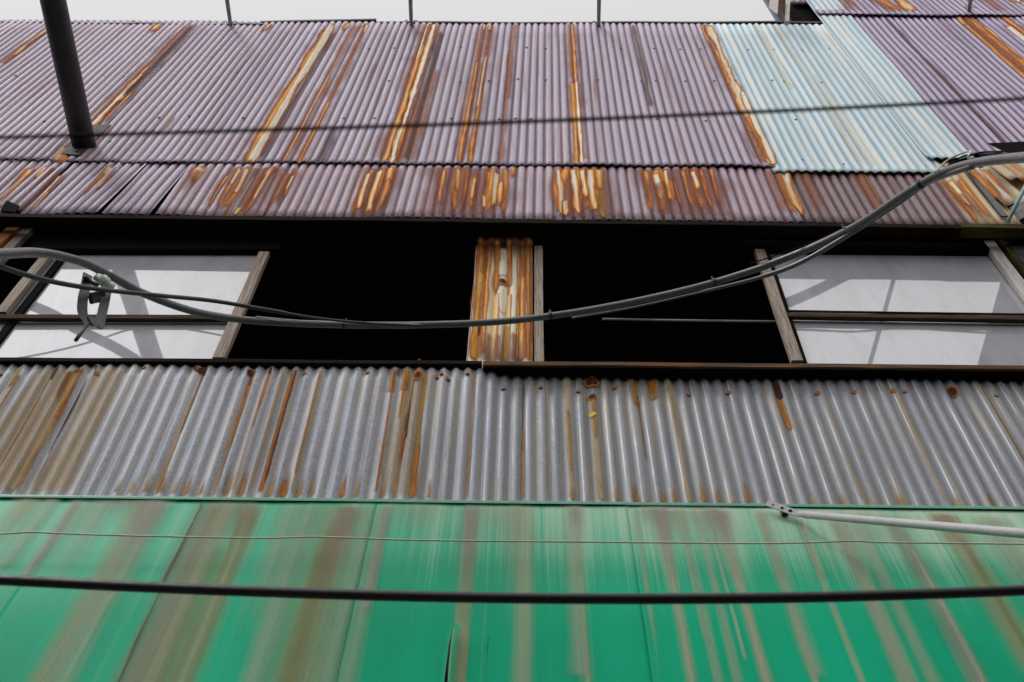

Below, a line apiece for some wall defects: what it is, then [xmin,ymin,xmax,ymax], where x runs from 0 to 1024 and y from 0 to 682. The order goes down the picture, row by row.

rust [91,25,195,125]
rust [210,23,369,215]
rust [352,23,443,215]
rust [430,23,516,215]
rust [551,24,608,217]
rust [639,167,722,215]
rust [700,24,817,215]
rust [873,0,1006,142]
rust [941,163,1024,221]
rust [955,0,1024,78]
rust [375,358,450,497]
rust [465,235,533,495]